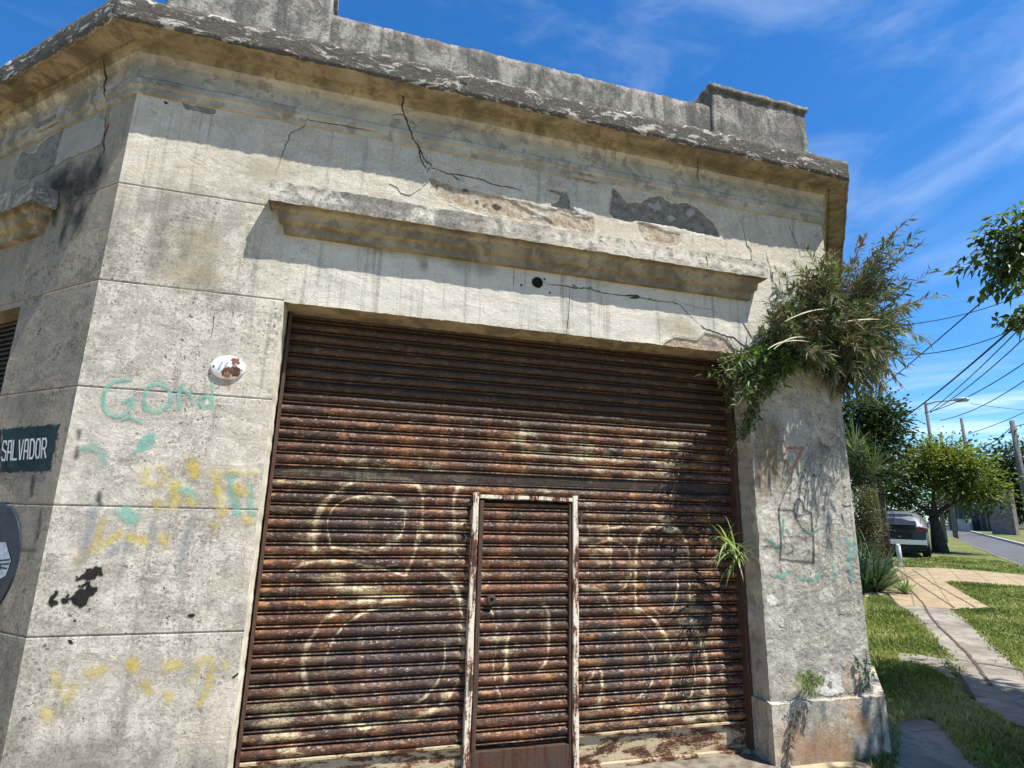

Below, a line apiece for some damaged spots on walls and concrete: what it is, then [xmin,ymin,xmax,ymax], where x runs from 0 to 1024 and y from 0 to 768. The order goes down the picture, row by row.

crack [98,56,109,154]
crack [275,117,373,174]
crack [392,95,519,190]
damp [51,157,103,239]
spalling [389,177,595,234]
spalling [609,188,720,246]
crack [543,279,754,351]
spalling [659,324,735,353]